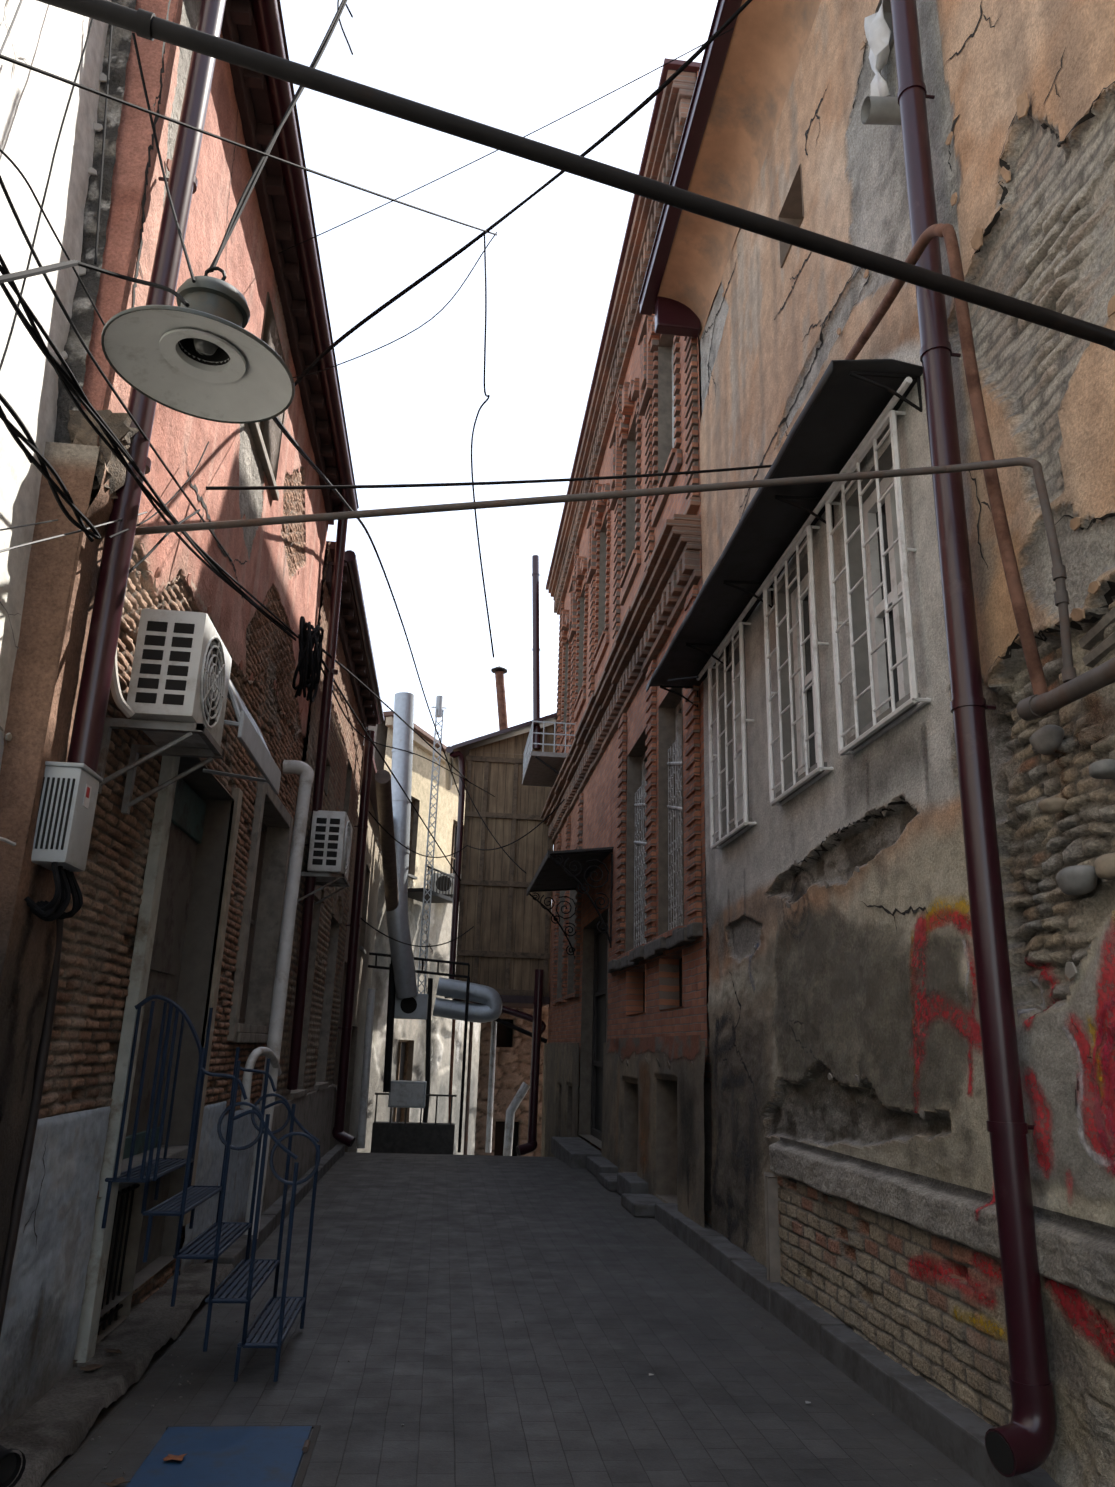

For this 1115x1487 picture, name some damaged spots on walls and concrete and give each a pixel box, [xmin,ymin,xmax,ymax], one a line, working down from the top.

crack [943,1,1002,68]
flaking render [844,28,912,262]
crack [948,114,960,171]
flaking render [774,264,908,450]
flaking render [916,0,1115,1021]
flaking render [764,794,922,908]
flaking render [763,1060,952,1149]